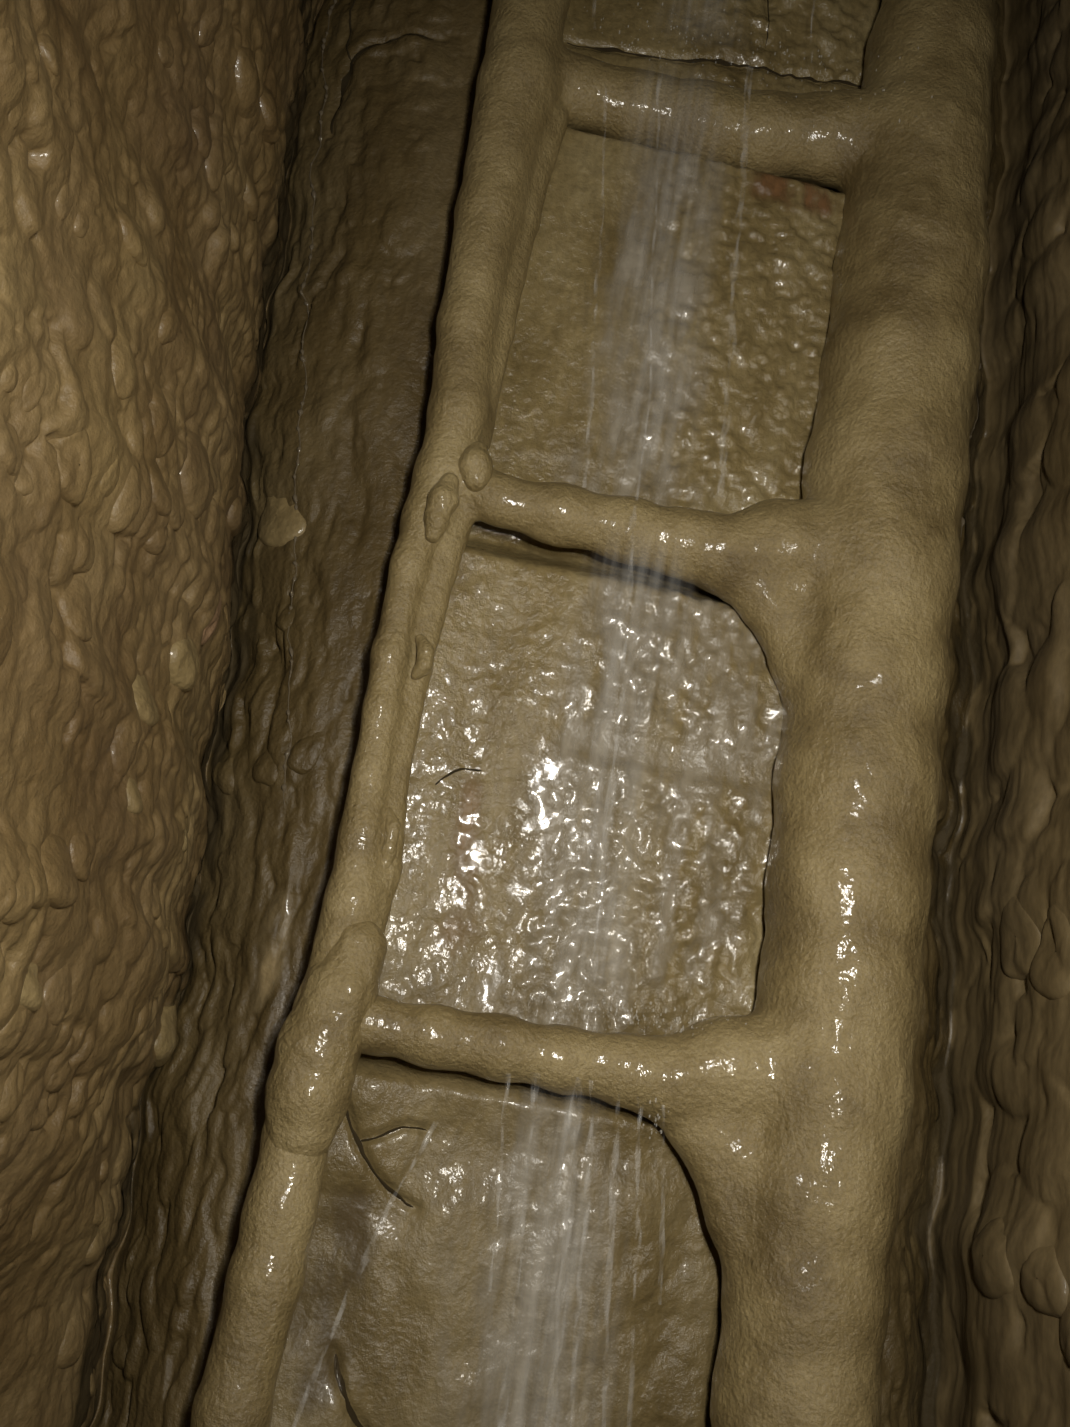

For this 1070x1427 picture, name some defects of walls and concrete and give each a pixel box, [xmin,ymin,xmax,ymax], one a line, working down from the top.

crack [567,0,861,87]
water stain [617,222,701,417]
water stain [535,564,753,931]
water stain [544,906,603,1029]
water stain [484,1134,573,1427]